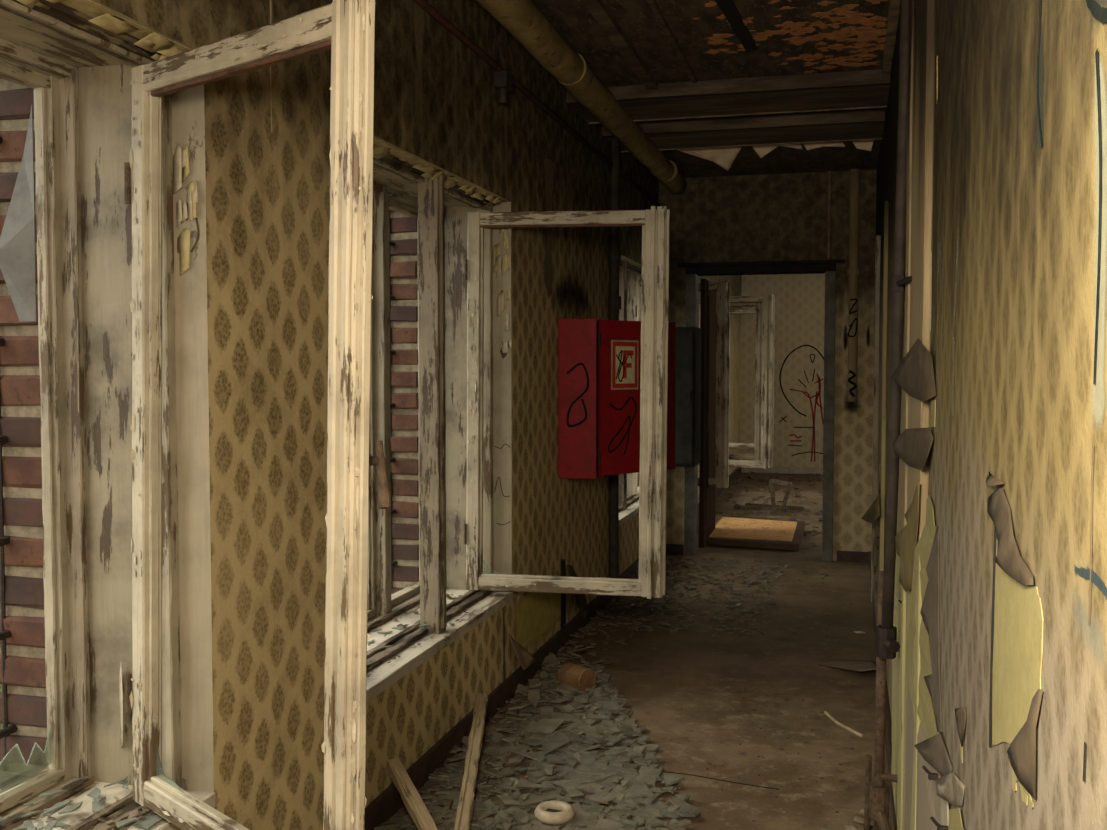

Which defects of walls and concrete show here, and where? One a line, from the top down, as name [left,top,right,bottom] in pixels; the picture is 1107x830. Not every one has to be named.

peeling [17,0,218,62]
peeling [704,0,888,74]
peeling [904,684,949,830]